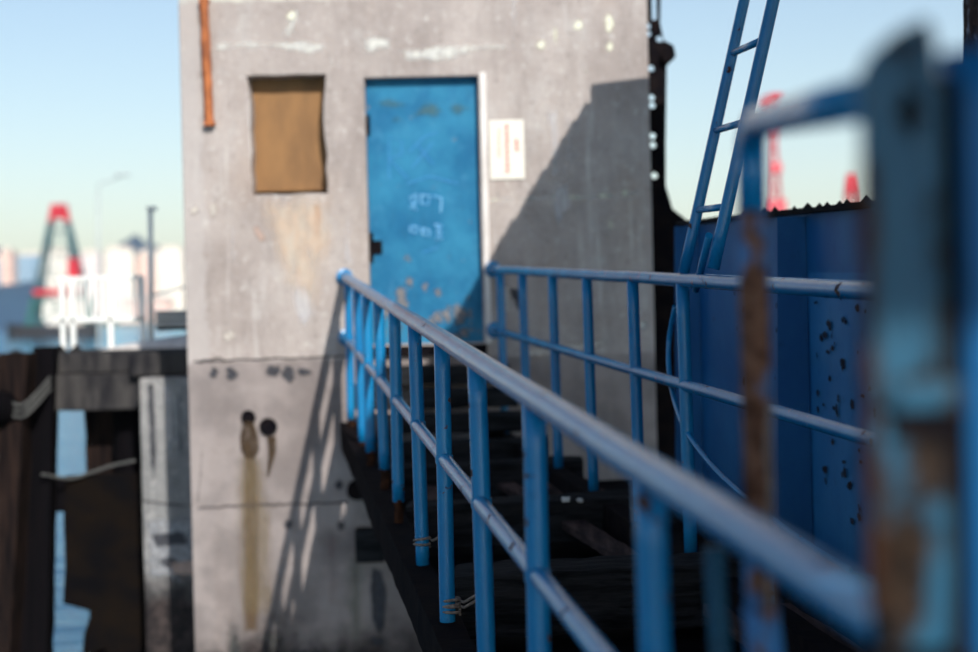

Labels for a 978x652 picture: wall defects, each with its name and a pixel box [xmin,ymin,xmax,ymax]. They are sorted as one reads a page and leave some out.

peeling [396,278,412,307]
peeling [431,305,468,339]